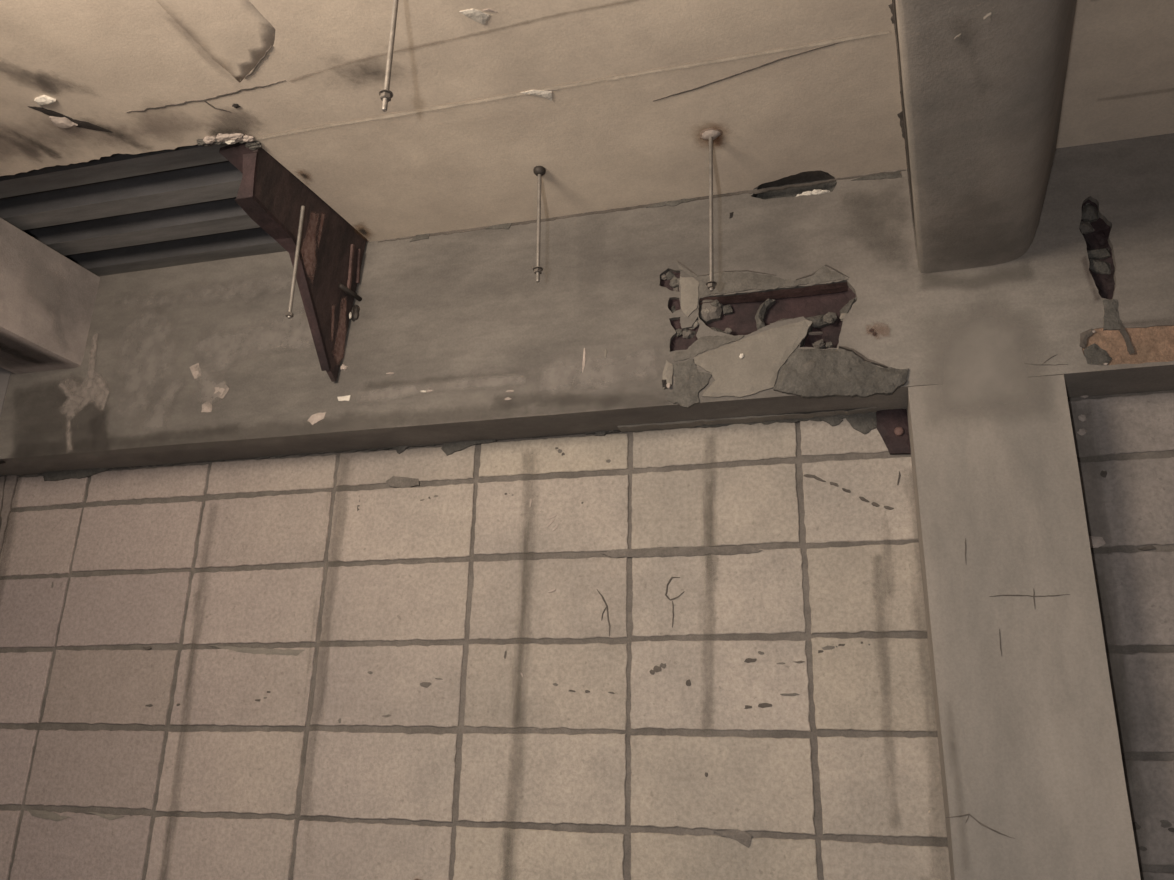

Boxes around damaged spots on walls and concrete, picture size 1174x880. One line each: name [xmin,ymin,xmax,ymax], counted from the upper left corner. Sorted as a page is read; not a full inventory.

spalling [753,170,836,199]
spalling [661,260,909,408]
spalling [1079,199,1174,365]